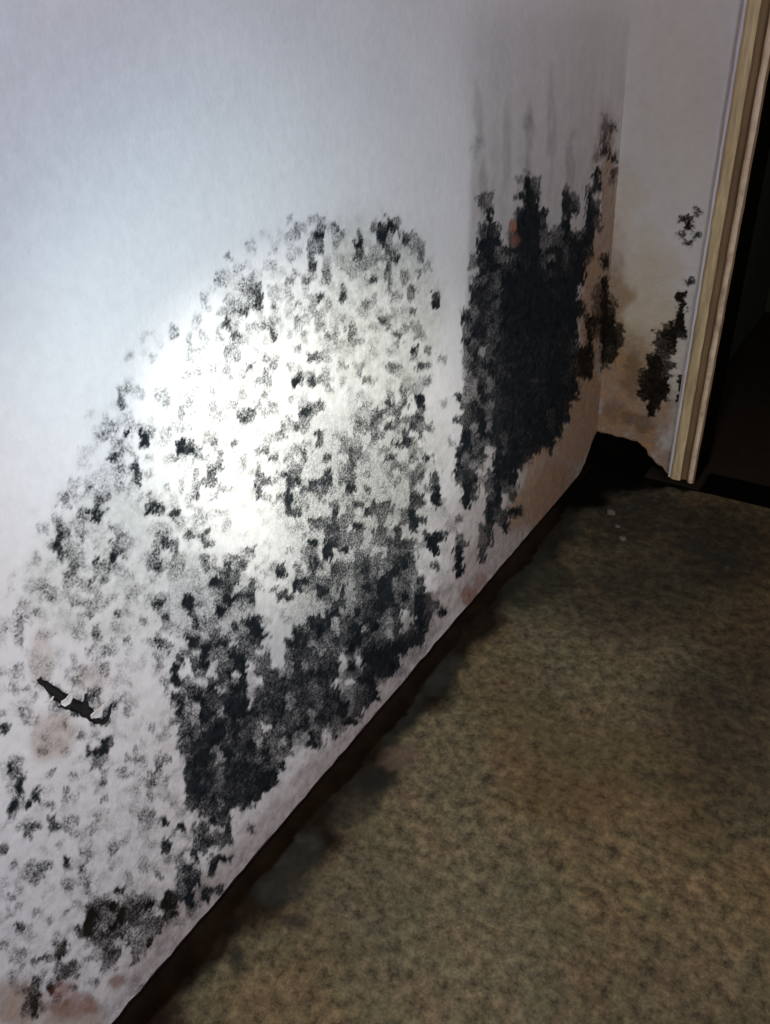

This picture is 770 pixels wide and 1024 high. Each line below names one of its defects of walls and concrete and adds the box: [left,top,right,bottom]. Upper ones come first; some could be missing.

leakage [0,309,448,1019]
leakage [144,119,770,1024]
flaking render [580,430,667,477]